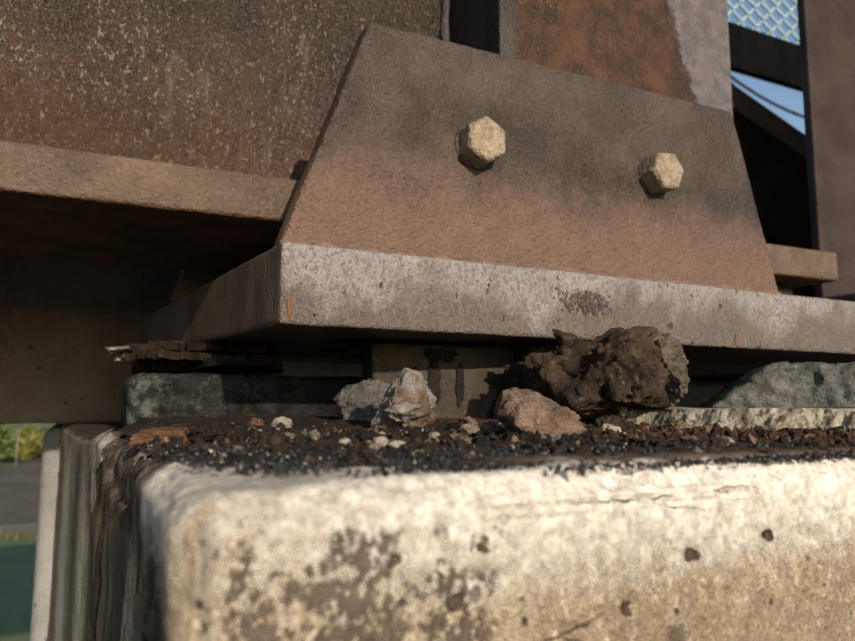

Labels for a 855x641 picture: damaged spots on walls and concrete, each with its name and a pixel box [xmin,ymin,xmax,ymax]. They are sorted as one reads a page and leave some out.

leakage [54,449,90,641]
leakage [120,501,160,641]
crack [546,613,604,641]